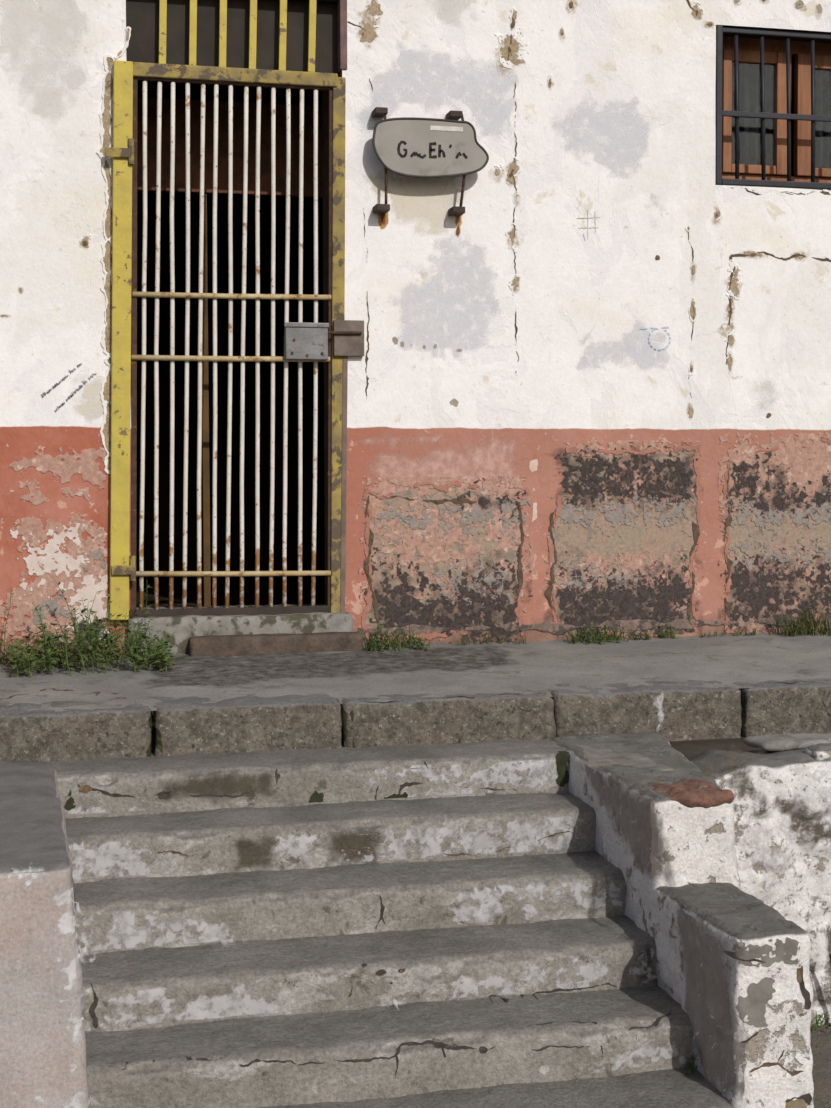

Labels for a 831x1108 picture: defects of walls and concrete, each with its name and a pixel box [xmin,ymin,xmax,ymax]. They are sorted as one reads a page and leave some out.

crack [687,0,716,28]
peeling [0,26,131,647]
crack [685,225,831,418]
peeling [358,440,703,644]
peeling [718,433,831,634]
crack [89,983,98,1028]
crack [186,1040,495,1075]
peeling [723,937,799,1028]